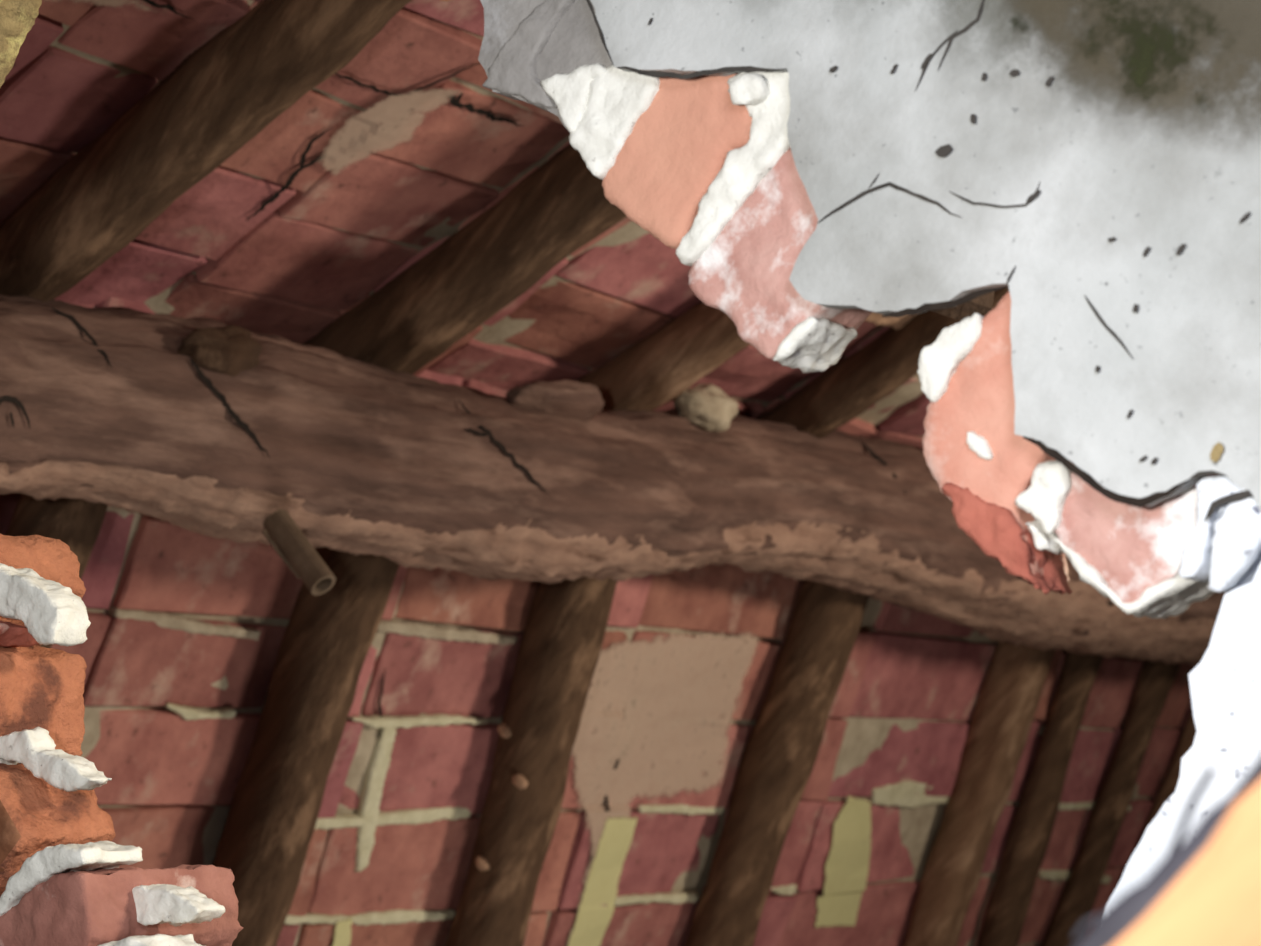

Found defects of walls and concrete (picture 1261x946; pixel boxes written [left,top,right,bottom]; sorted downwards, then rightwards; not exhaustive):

leakage [950,0,1040,40]
flaking render [478,0,612,133]
peeling [728,73,771,106]
crack [915,0,984,90]
crack [246,127,333,221]
crack [818,174,1040,223]
spalling [935,144,953,157]
spalling [866,312,917,330]
crack [191,359,270,458]
crack [458,400,550,495]
peeling [967,431,994,460]